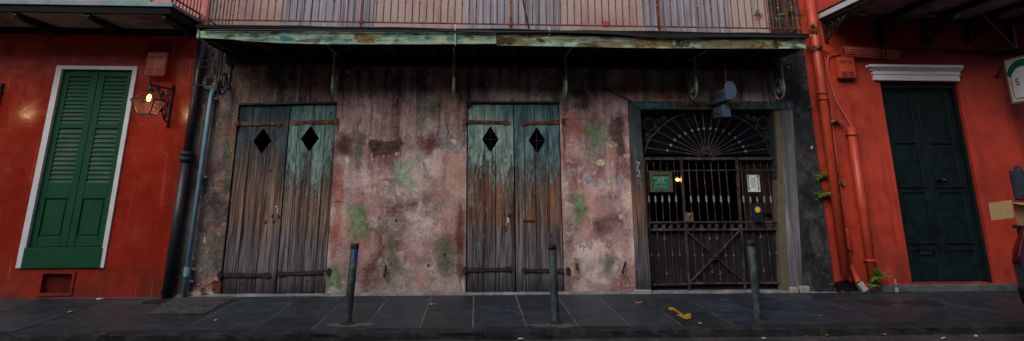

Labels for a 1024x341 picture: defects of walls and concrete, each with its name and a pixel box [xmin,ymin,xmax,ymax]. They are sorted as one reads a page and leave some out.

spalling [365,136,403,157]